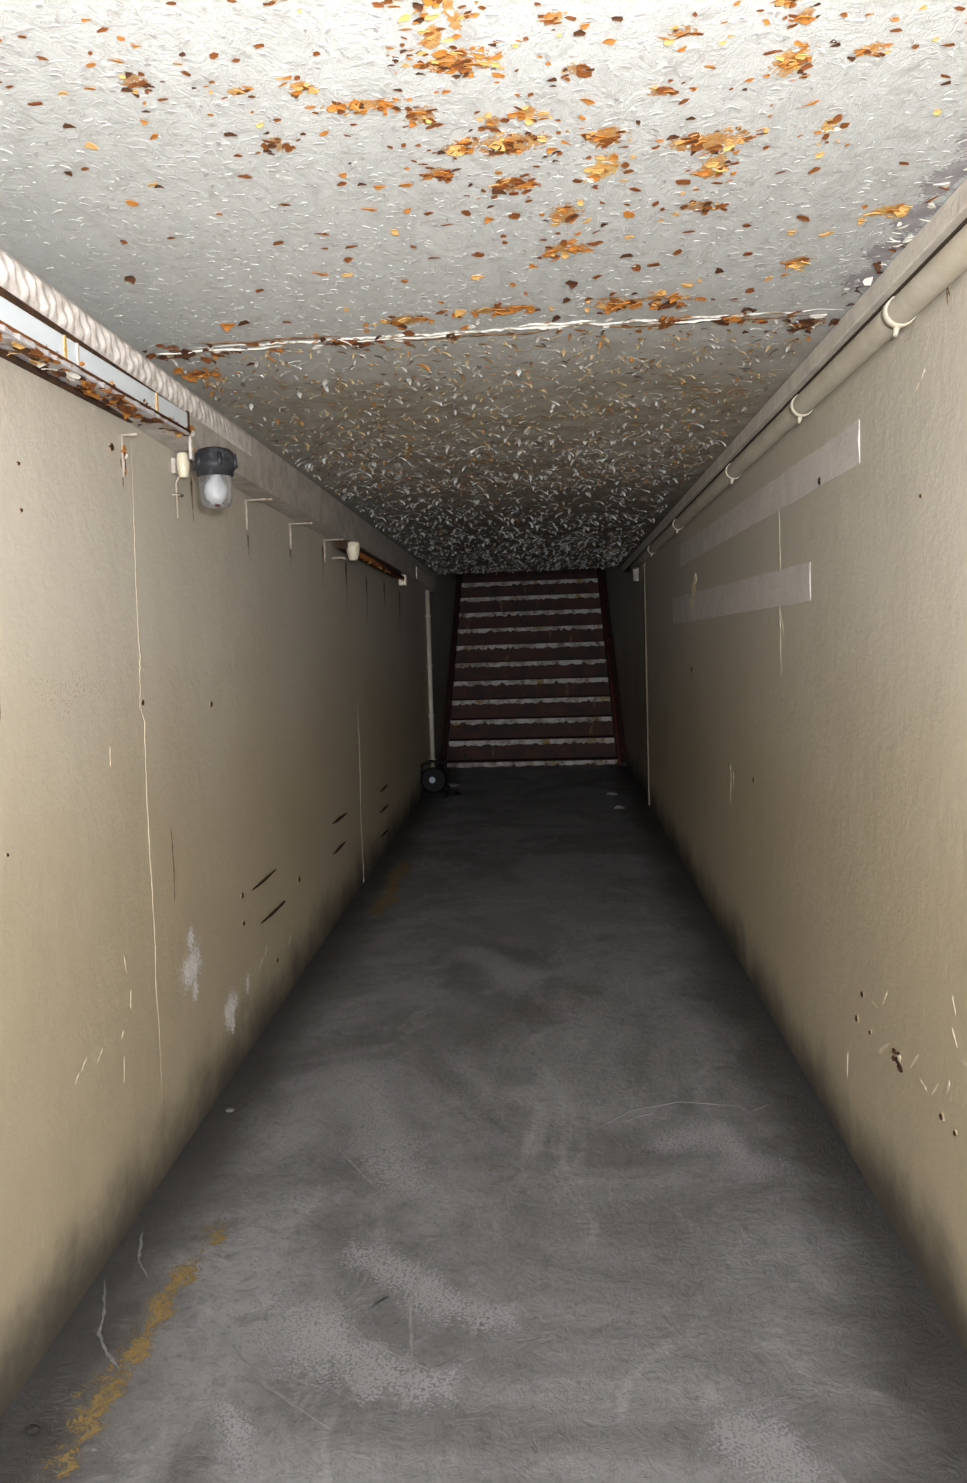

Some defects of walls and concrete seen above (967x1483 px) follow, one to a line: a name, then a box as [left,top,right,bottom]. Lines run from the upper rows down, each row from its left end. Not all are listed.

rust [0,333,188,437]
peeling [0,0,967,575]
crack [130,424,176,1085]